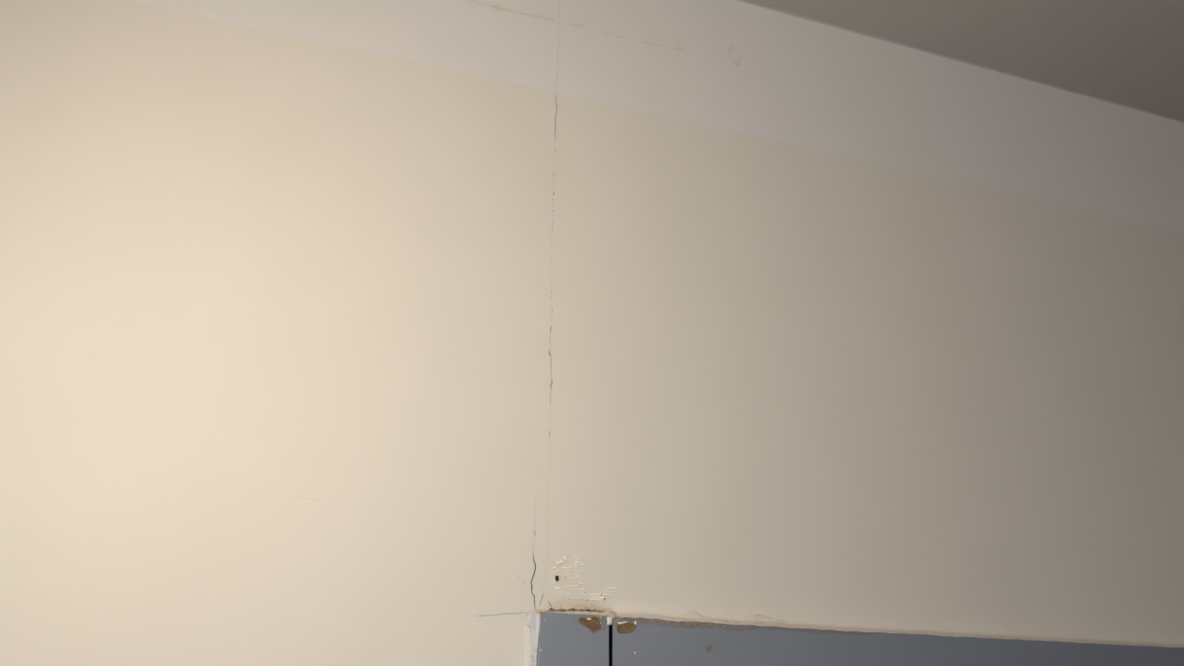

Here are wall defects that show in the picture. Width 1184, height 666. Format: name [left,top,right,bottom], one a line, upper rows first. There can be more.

rust [566,611,605,631]
rust [617,621,637,633]